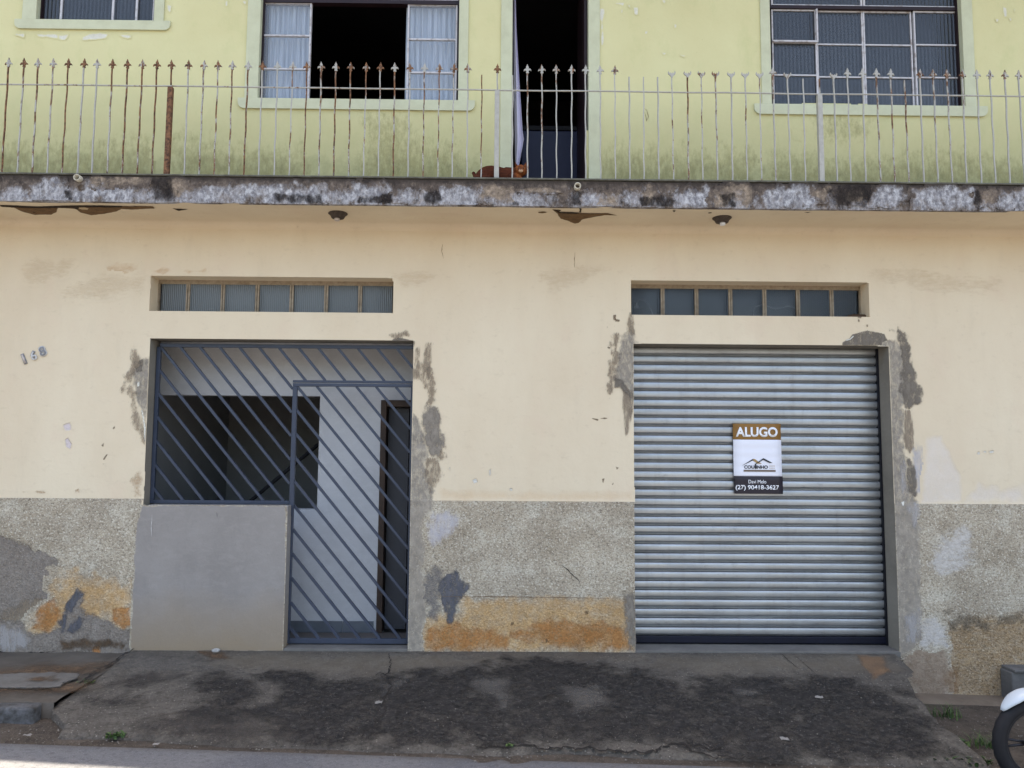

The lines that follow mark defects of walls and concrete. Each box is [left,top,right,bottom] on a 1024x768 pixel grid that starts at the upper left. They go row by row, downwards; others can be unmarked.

leakage [0,110,488,201]
peeling [0,175,154,215]
peeling [164,176,1024,224]
spalling [842,317,887,346]
leakage [422,569,636,653]